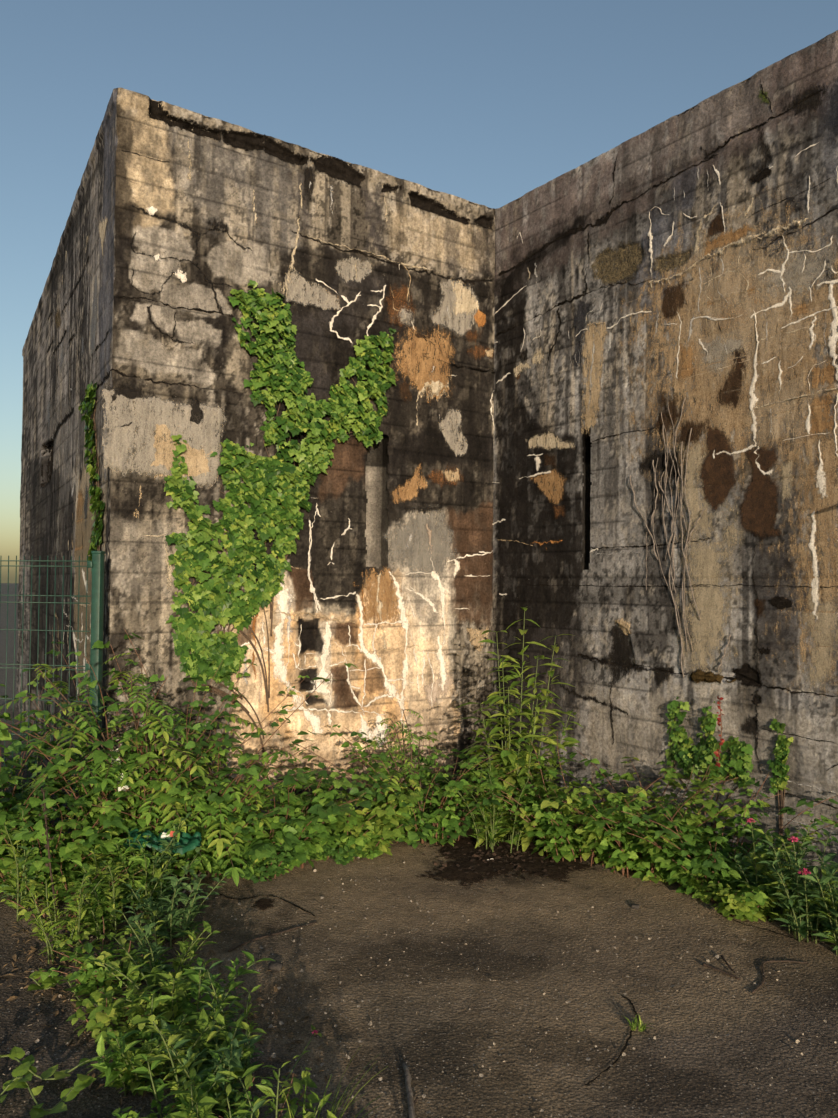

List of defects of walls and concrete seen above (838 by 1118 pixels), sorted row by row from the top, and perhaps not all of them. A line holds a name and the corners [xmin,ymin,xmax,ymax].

leakage [781,85,838,142]
crack [292,79,822,448]
spalling [591,212,755,286]
crack [752,142,838,250]
peeling [100,382,227,487]
spalling [519,431,575,519]
leakage [568,186,838,694]
leakage [249,505,456,747]